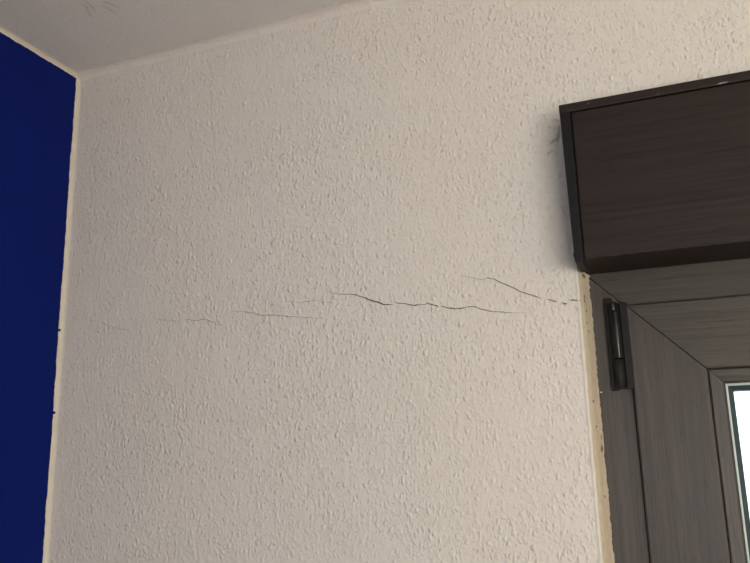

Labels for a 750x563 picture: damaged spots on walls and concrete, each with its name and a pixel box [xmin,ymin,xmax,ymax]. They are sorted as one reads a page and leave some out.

crack [460,275,580,305]
crack [234,292,512,319]